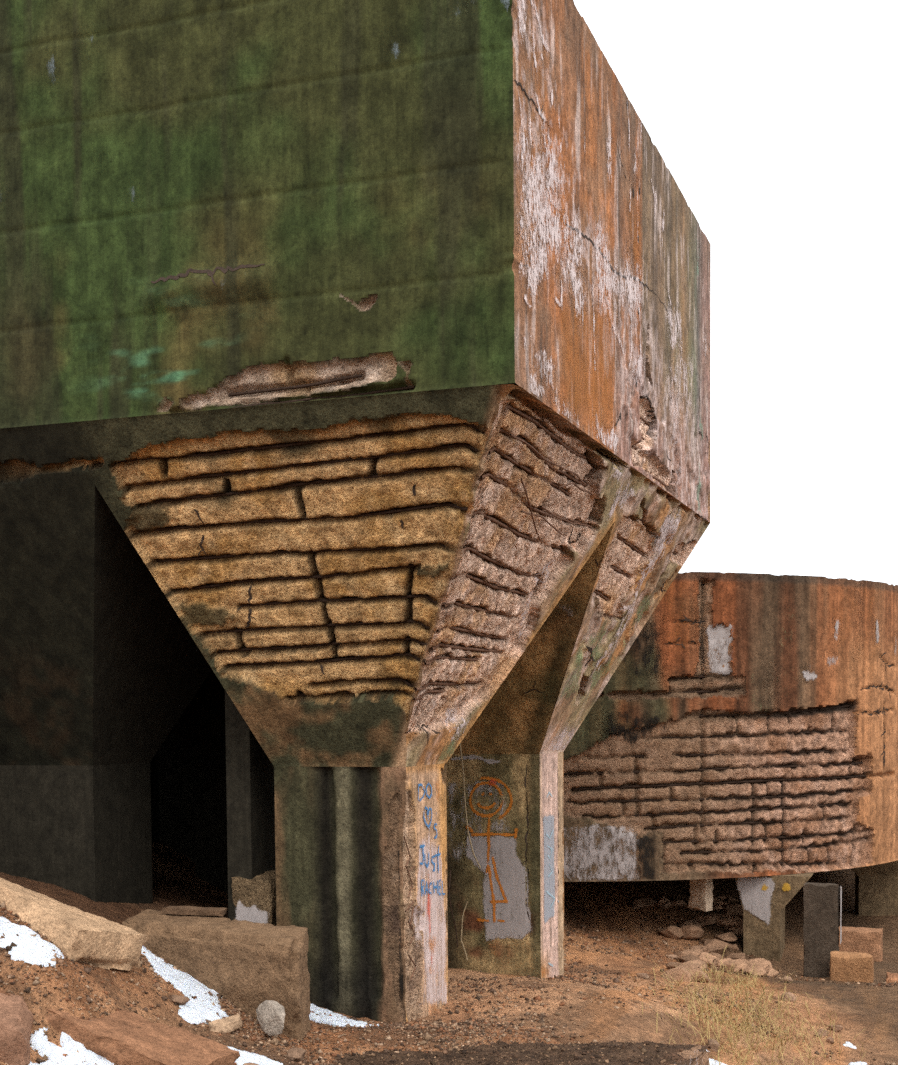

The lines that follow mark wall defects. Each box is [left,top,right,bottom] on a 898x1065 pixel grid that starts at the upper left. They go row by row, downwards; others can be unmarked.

efflorescence [504,0,550,67]
crack [515,79,548,123]
efflorescence [517,90,645,393]
crack [566,224,674,319]
damp [530,350,579,425]
spalling [631,327,676,498]
spalling [0,391,608,736]
spalling [563,578,875,875]